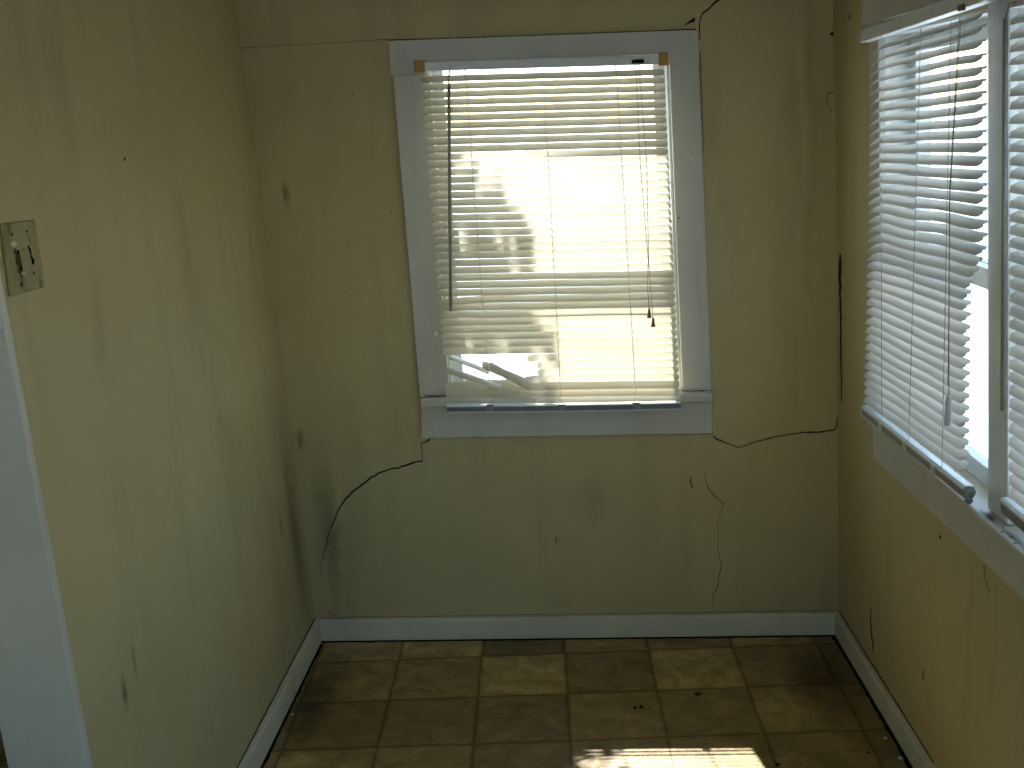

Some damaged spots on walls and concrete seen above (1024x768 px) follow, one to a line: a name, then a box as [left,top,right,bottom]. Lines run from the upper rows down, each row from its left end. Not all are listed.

crack [685,0,720,40]
crack [713,254,842,449]
crack [320,439,430,574]